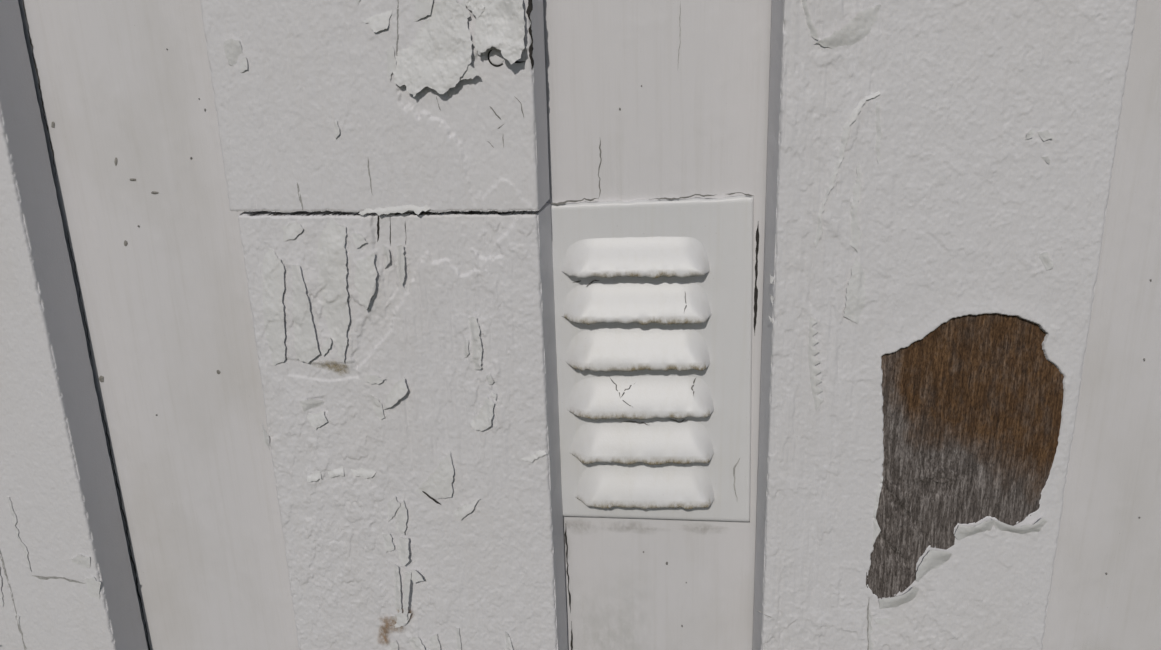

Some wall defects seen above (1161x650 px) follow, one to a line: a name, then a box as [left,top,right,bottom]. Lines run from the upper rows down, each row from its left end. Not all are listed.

peeling [386,0,525,97]
peeling [802,0,881,49]
peeling [359,205,432,215]
crack [550,140,602,206]
crack [650,192,754,200]
peeling [866,313,1064,625]
peeling [382,497,424,629]